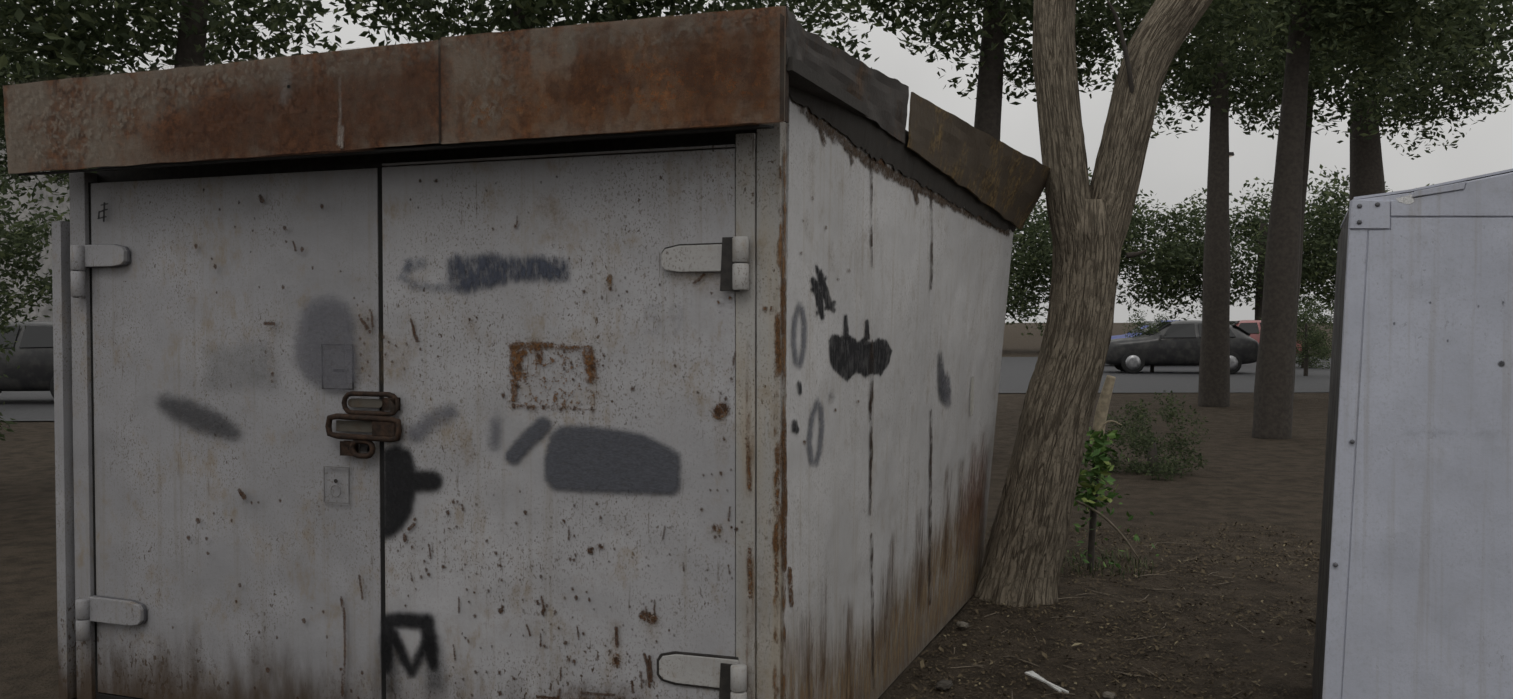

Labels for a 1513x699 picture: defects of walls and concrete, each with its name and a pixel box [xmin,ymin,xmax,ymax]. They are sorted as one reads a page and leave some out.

rust [870,156,887,262]
rust [501,340,600,412]
rust [712,392,729,440]
rust [747,131,806,644]
rust [858,339,874,515]
rust [703,438,752,491]
rust [773,668,786,699]